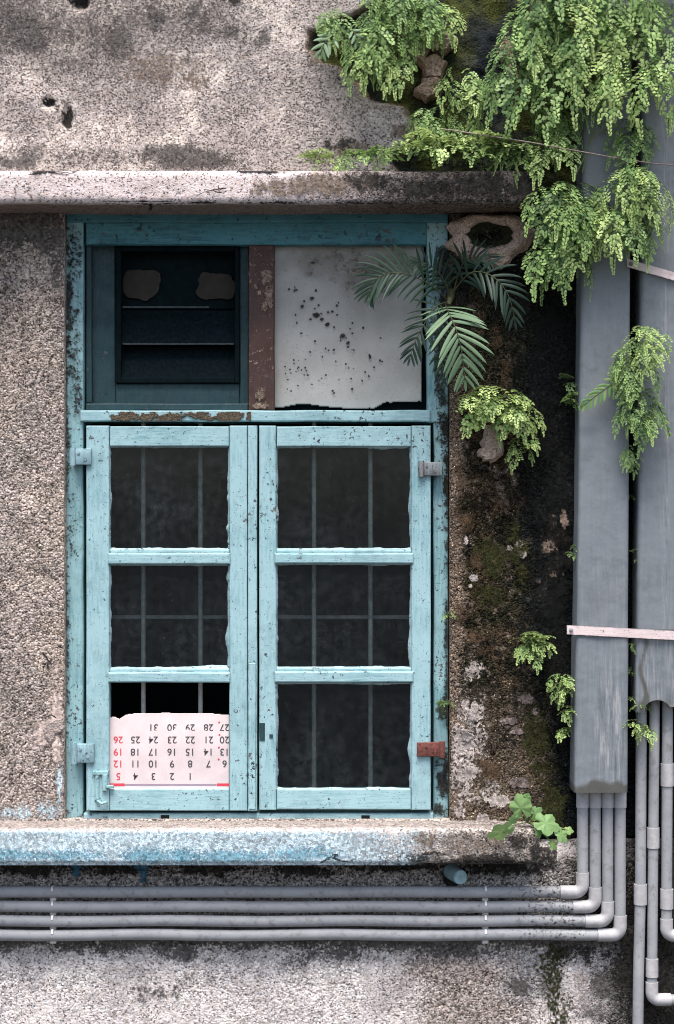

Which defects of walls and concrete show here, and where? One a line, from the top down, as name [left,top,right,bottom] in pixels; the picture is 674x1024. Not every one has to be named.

flaking render [413,32,458,104]
flaking render [43,98,73,129]
flaking render [388,124,412,139]
leakage [249,136,536,205]
leakage [434,245,577,775]
leakage [434,747,448,818]
peeling [0,828,430,865]